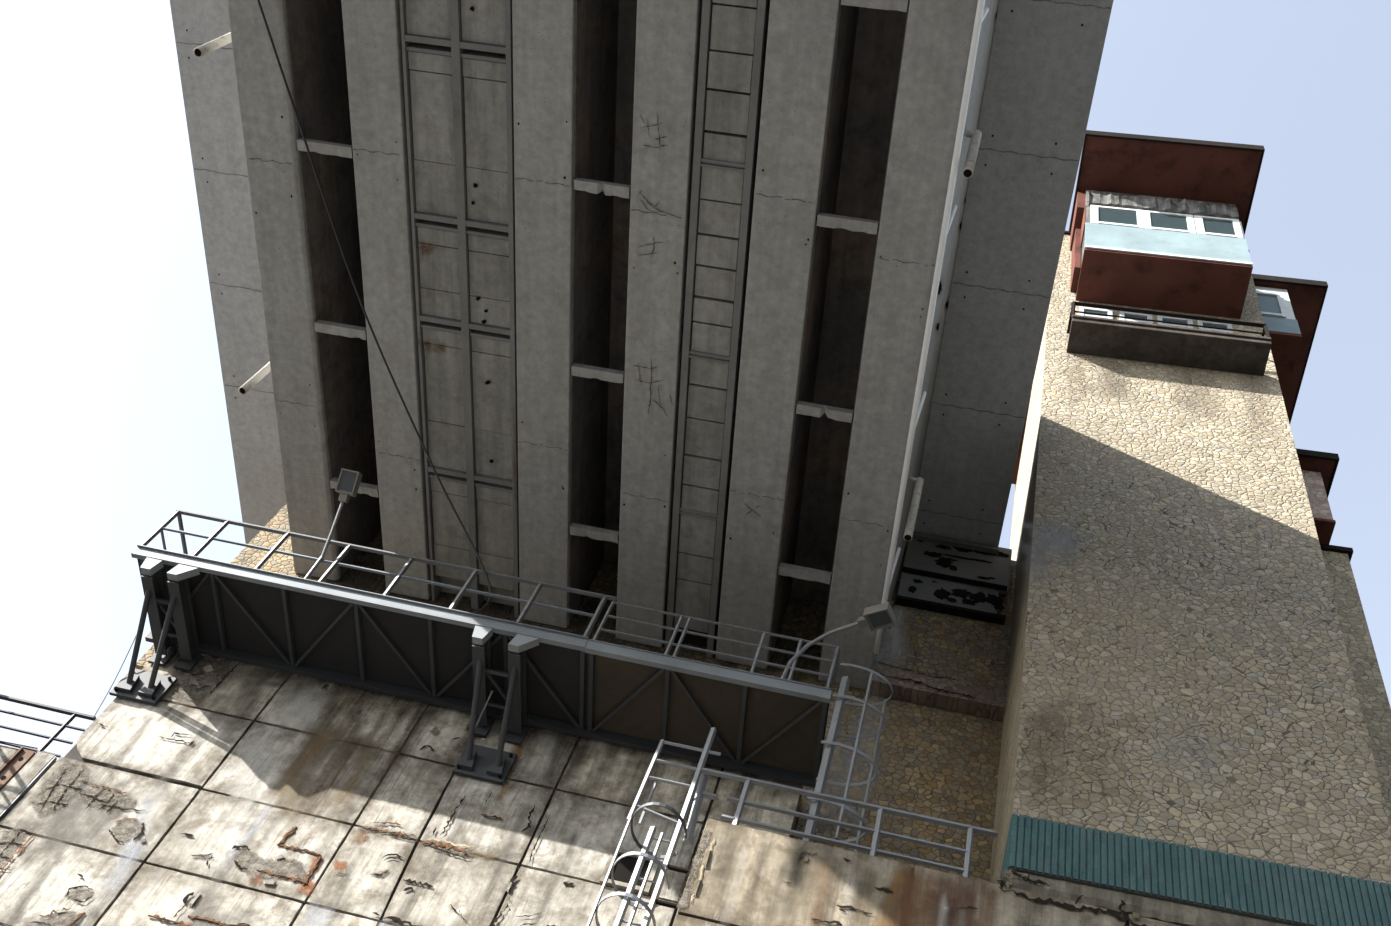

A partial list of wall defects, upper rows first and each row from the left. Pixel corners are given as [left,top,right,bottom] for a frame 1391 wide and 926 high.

peeling [907,540,1009,610]
spalling [30,760,147,844]
spalling [0,826,36,874]
spalling [232,826,322,894]
spalling [678,829,715,907]
spalling [996,869,1049,889]